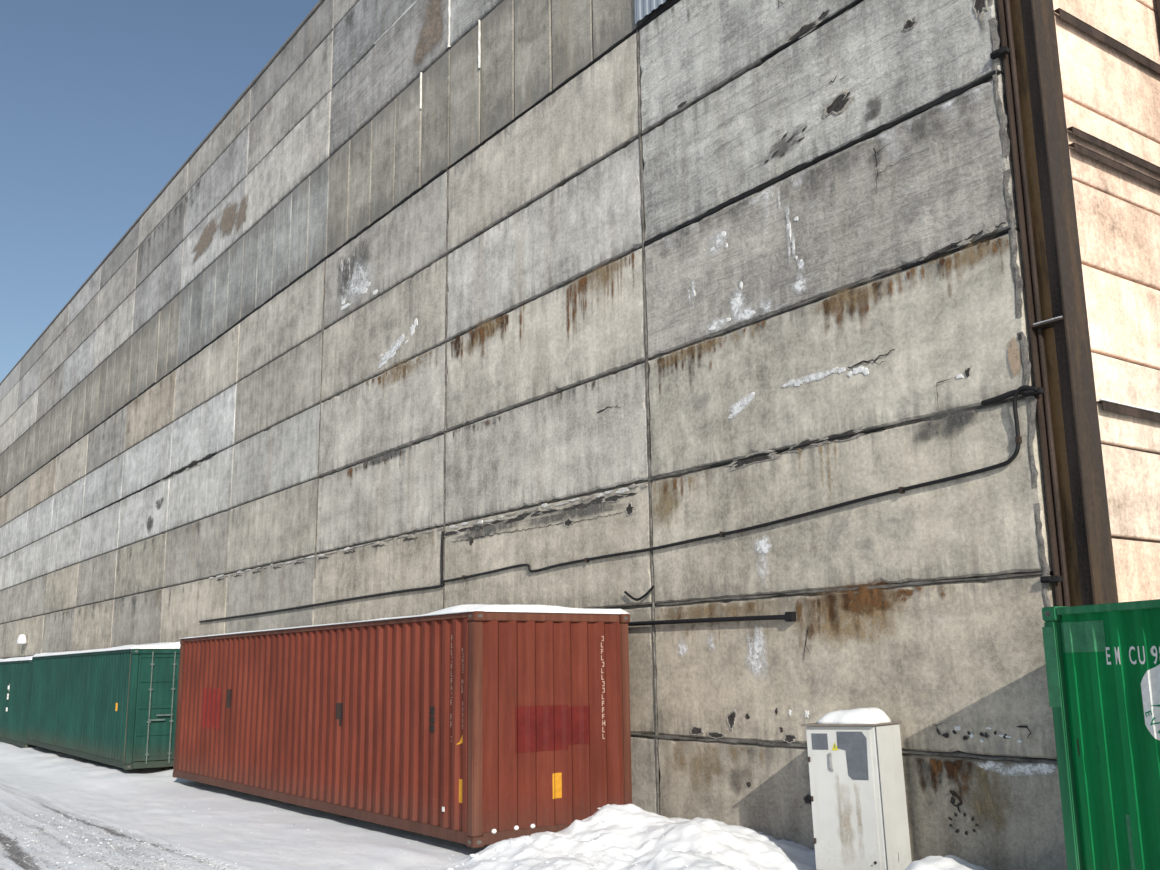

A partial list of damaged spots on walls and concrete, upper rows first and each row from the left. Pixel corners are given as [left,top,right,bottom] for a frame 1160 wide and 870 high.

spalling [973,0,988,29]
spalling [822,76,854,119]
leakage [731,183,806,293]
rust [451,306,525,358]
rust [567,253,634,338]
leakage [708,282,770,331]
rust [823,238,1008,324]
crack [847,349,895,377]
spalling [209,484,648,581]
rust [796,583,922,640]
leakage [747,630,766,674]
spalling [689,708,750,739]